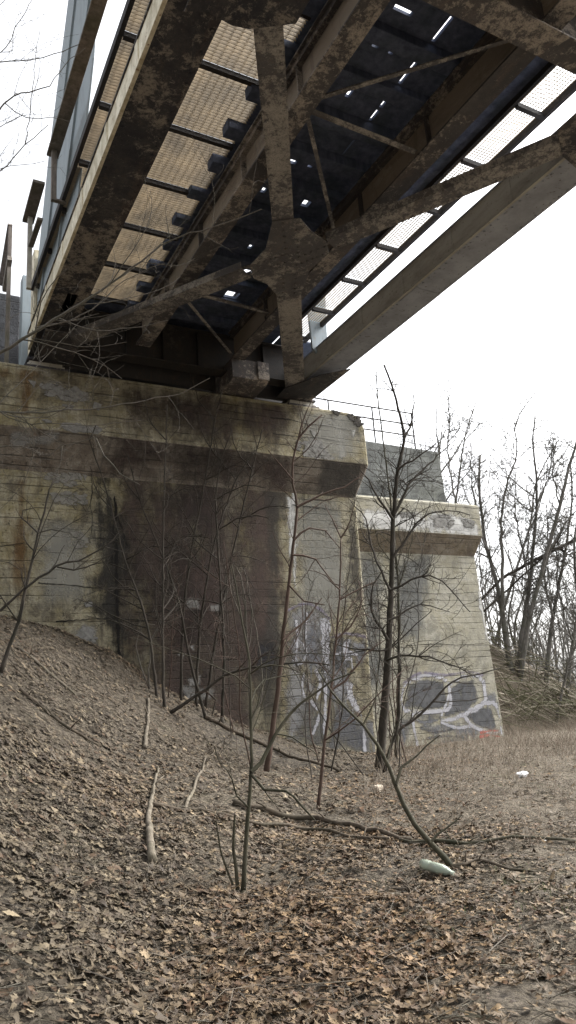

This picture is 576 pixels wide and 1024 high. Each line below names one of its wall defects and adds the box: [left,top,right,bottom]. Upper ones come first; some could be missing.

water stain [45,392,478,729]
spalling [431,514,475,528]